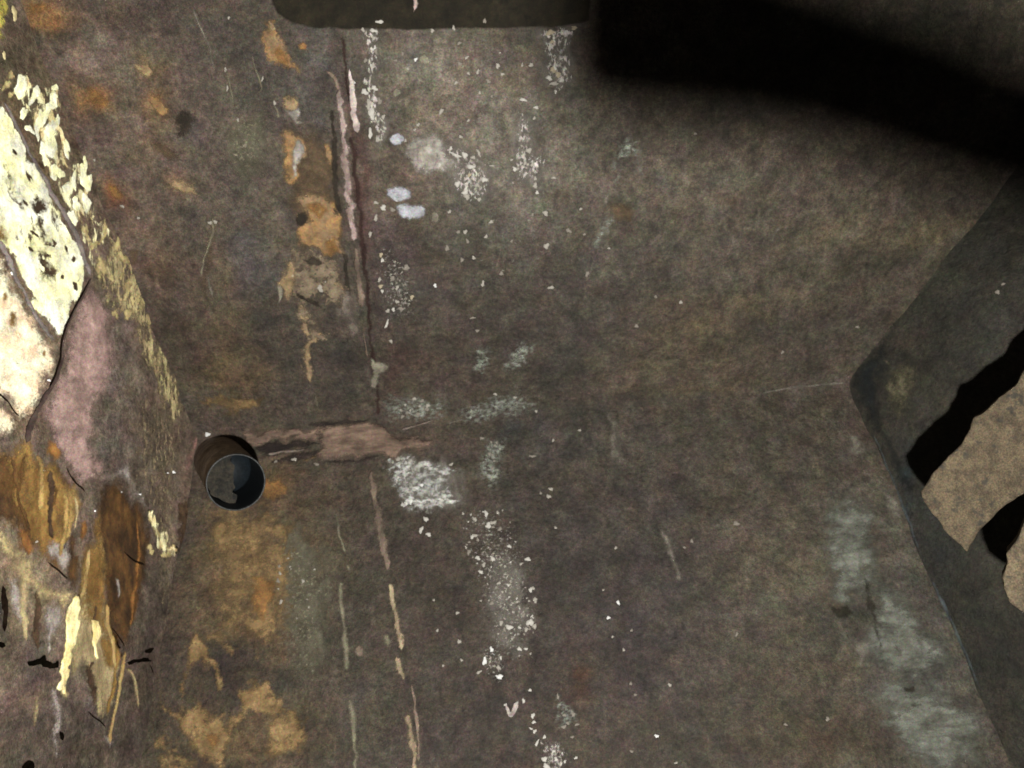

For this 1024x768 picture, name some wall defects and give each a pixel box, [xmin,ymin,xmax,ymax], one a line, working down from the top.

peeling [0,0,17,38]
peeling [0,51,183,603]
rust [261,20,306,72]
rust [299,304,321,382]
rust [283,96,350,302]
rust [350,138,380,415]
water stain [272,0,590,142]
water stain [444,135,495,201]
rust [0,442,150,643]
rust [154,681,305,768]
water stain [243,422,537,679]
water stain [825,500,984,768]